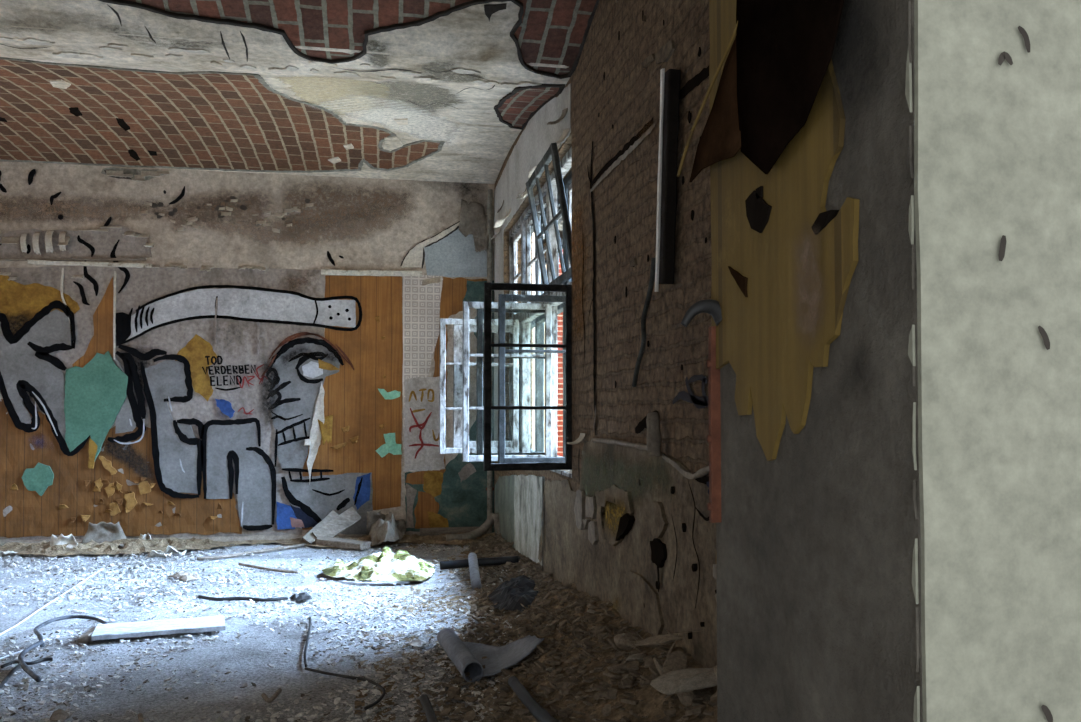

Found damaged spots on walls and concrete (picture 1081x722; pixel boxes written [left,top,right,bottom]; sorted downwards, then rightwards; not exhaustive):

spalling [0,0,600,181]
water stain [0,185,410,244]
peeling [401,166,537,286]
peeling [567,410,709,546]
peeling [649,486,675,592]